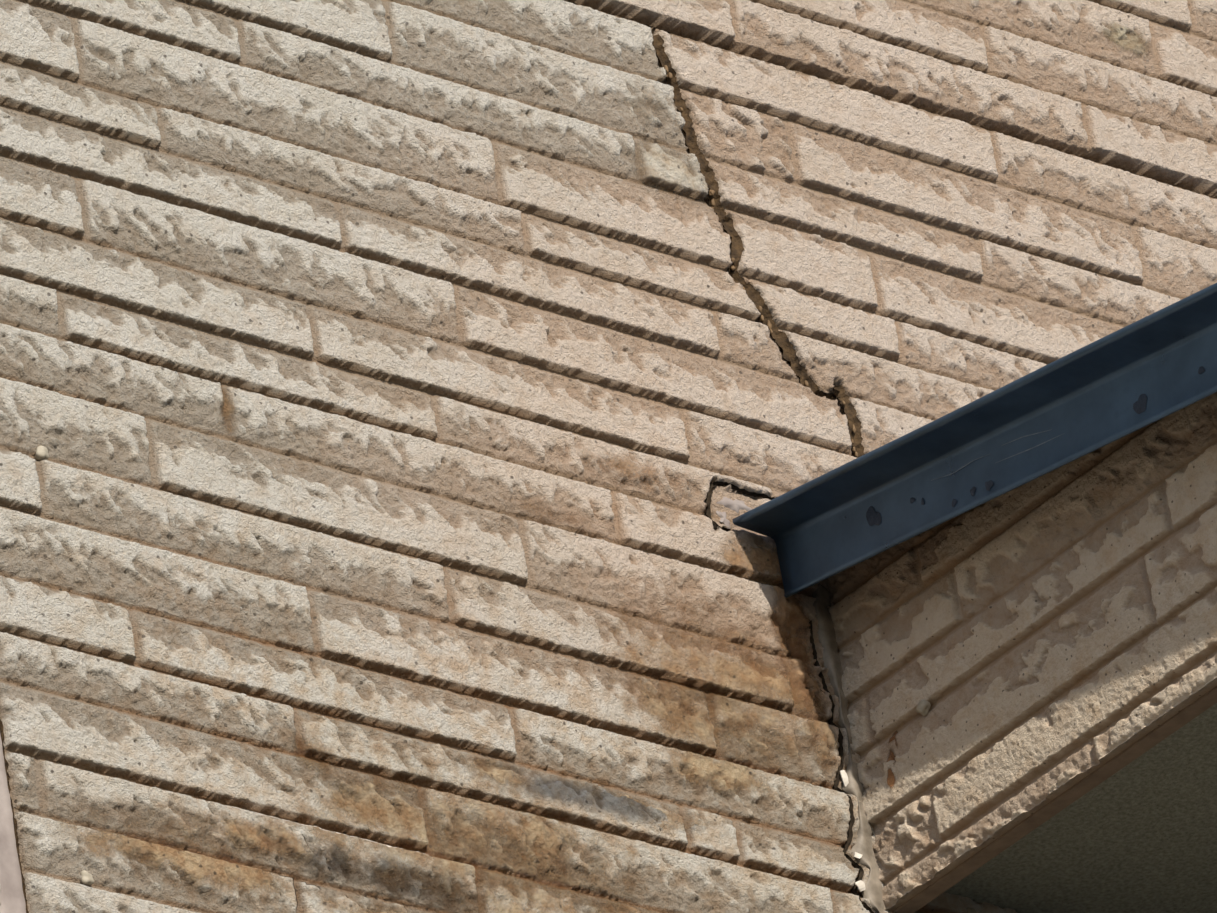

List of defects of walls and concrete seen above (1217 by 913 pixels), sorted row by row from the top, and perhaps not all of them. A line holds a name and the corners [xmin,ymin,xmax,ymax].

crack [652,34,864,458]
crack [705,481,774,532]
crack [809,620,875,913]